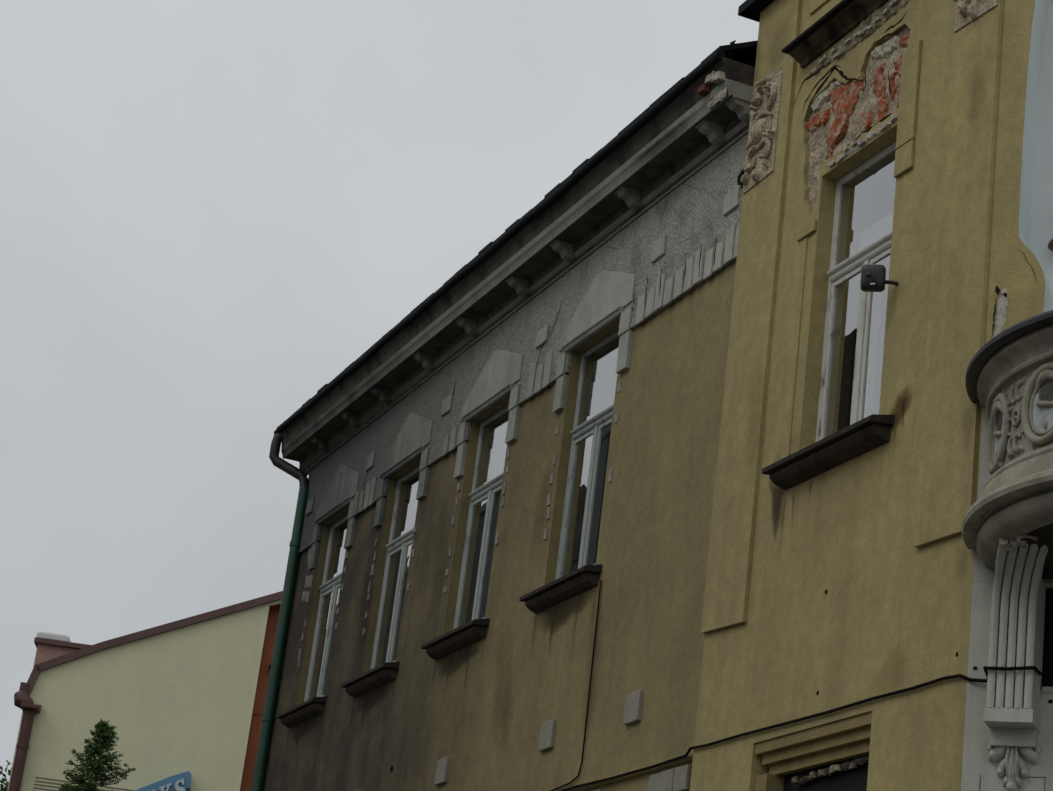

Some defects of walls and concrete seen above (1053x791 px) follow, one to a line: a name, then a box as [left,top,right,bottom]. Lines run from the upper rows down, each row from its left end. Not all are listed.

crack [793,56,840,109]
spalling [805,0,911,208]
spalling [792,755,869,787]